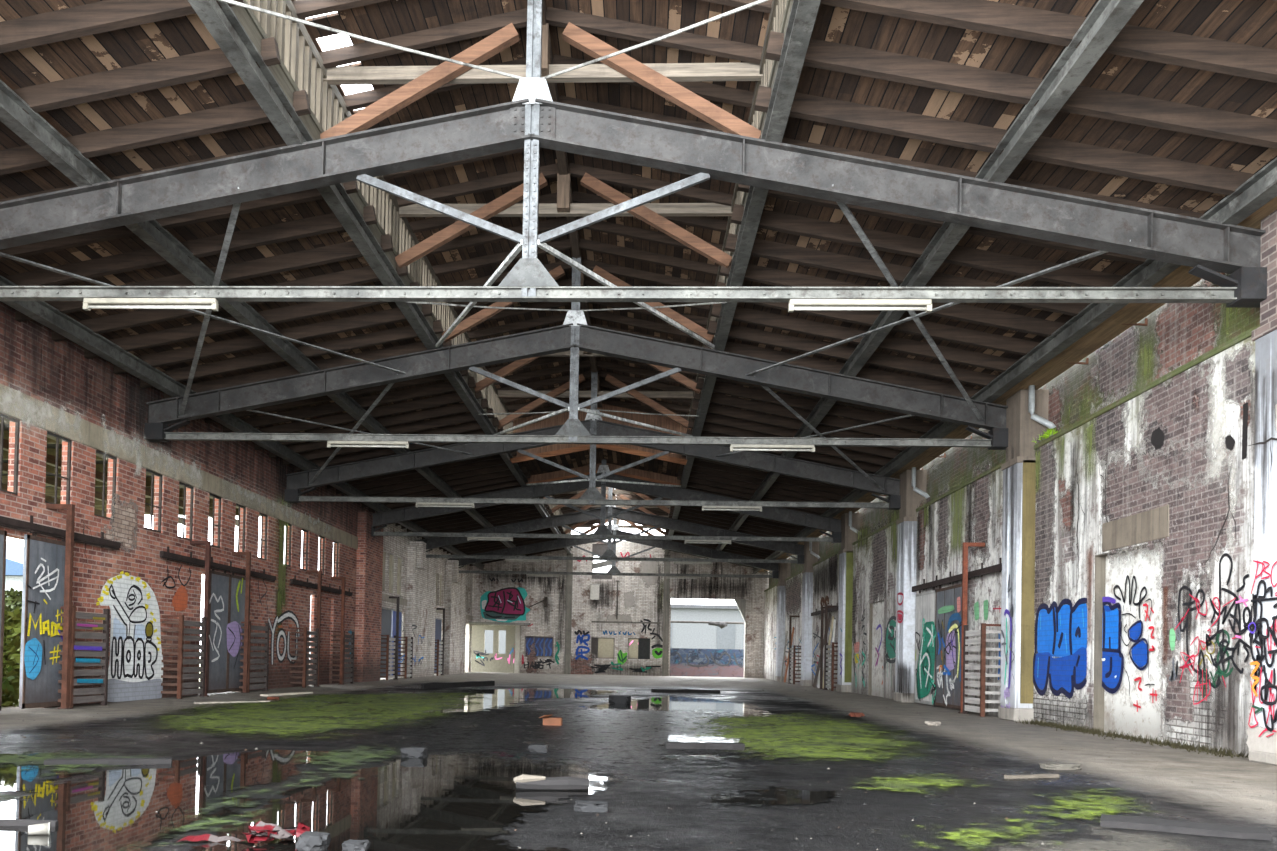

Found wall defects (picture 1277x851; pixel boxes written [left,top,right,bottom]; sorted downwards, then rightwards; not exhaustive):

water stain [1249,370,1275,488]
flaking render [852,515,888,643]
flaking render [917,485,950,572]
flaking render [972,459,992,566]
flaking render [1033,303,1254,749]